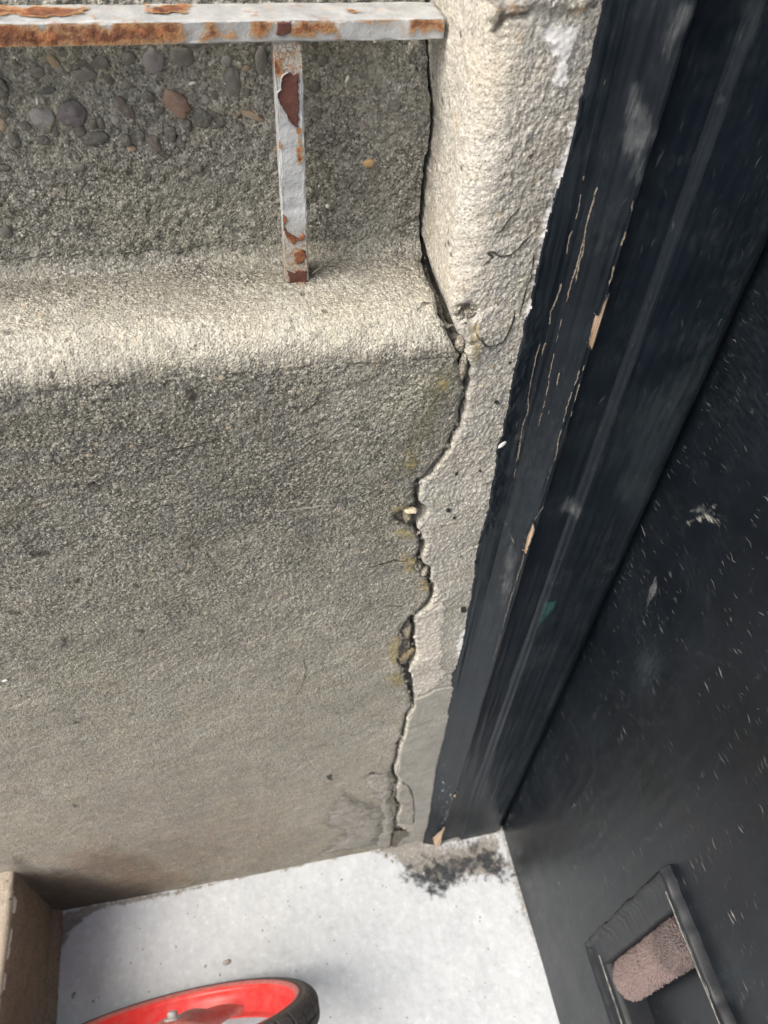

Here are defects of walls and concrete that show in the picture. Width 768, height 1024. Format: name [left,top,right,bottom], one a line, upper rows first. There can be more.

rust [0,3,191,47]
rust [199,22,236,43]
rust [249,21,275,38]
rust [290,21,339,37]
rust [346,9,445,35]
rust [274,58,304,165]
rust [282,213,308,283]
crack [417,205,534,448]
crack [369,477,436,847]